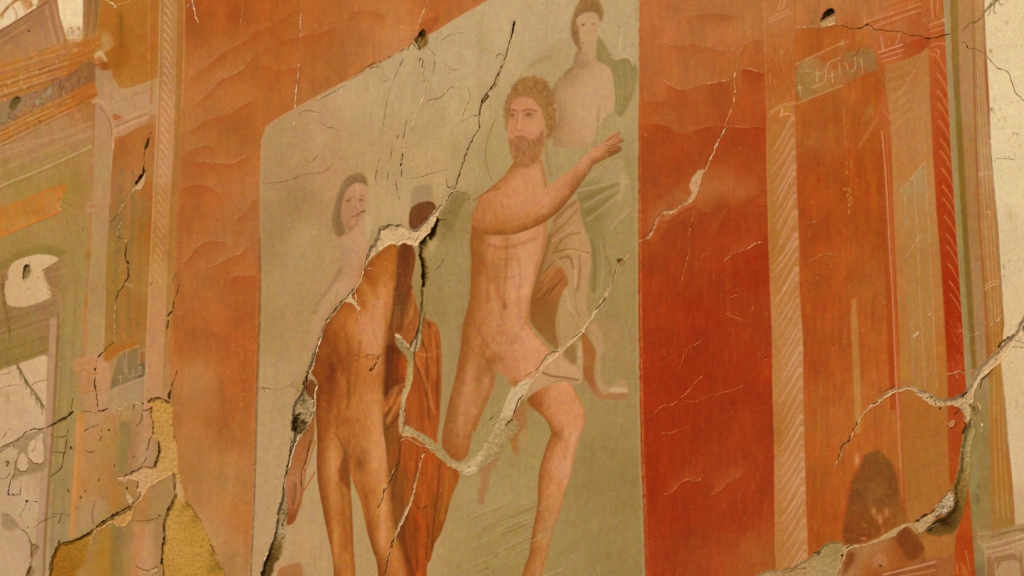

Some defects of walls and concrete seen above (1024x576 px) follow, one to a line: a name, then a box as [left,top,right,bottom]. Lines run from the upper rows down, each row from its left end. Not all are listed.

crack [375,21,515,204]
crack [616,39,763,291]
flaking render [795,8,836,28]
crack [843,23,1024,101]
crack [0,137,249,529]
peeling [48,397,227,576]
crack [260,254,369,576]
crack [835,421,857,467]